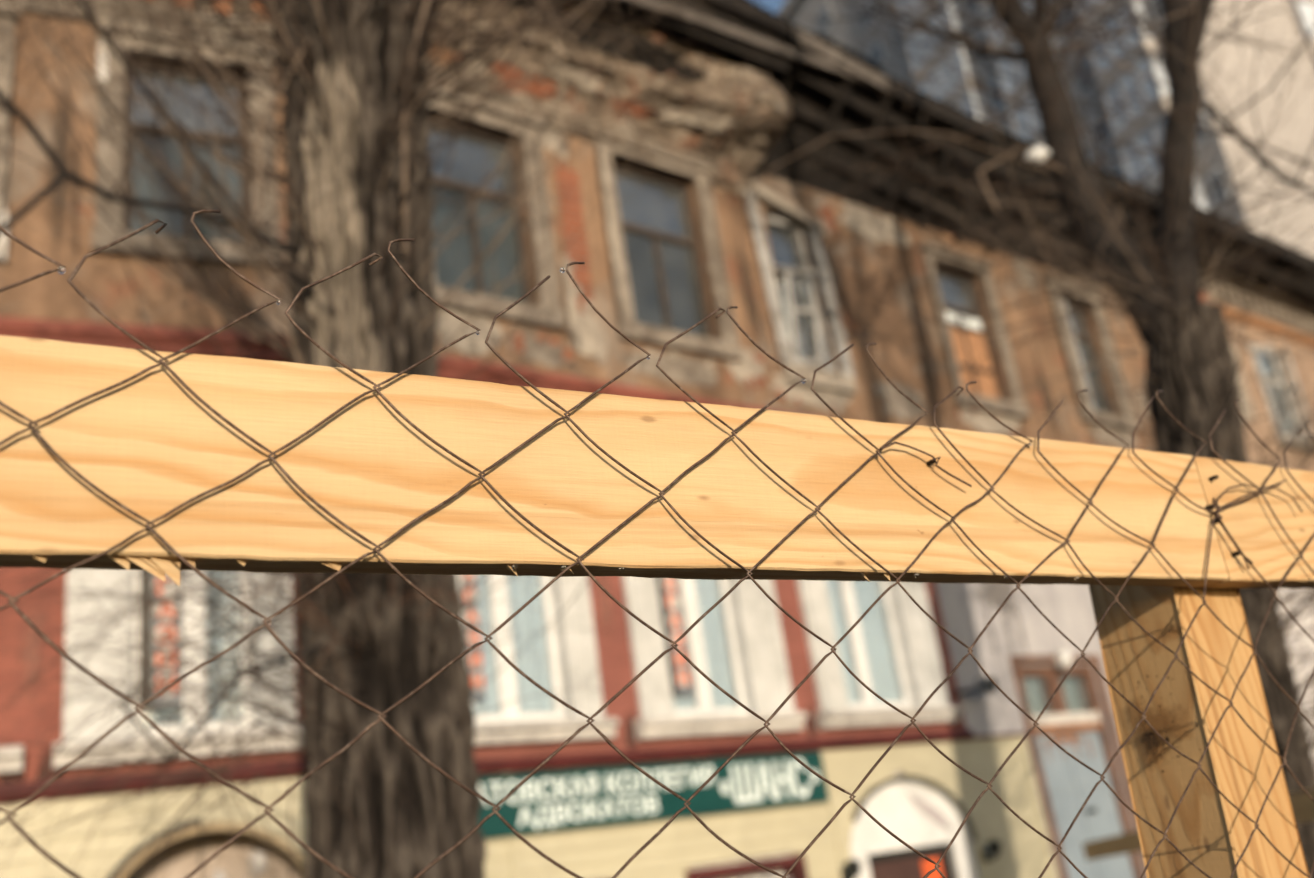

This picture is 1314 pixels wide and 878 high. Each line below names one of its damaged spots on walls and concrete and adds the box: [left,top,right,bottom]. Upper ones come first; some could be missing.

spalling [513,0,709,81]
peeling [547,66,739,134]
flaking render [436,126,852,414]